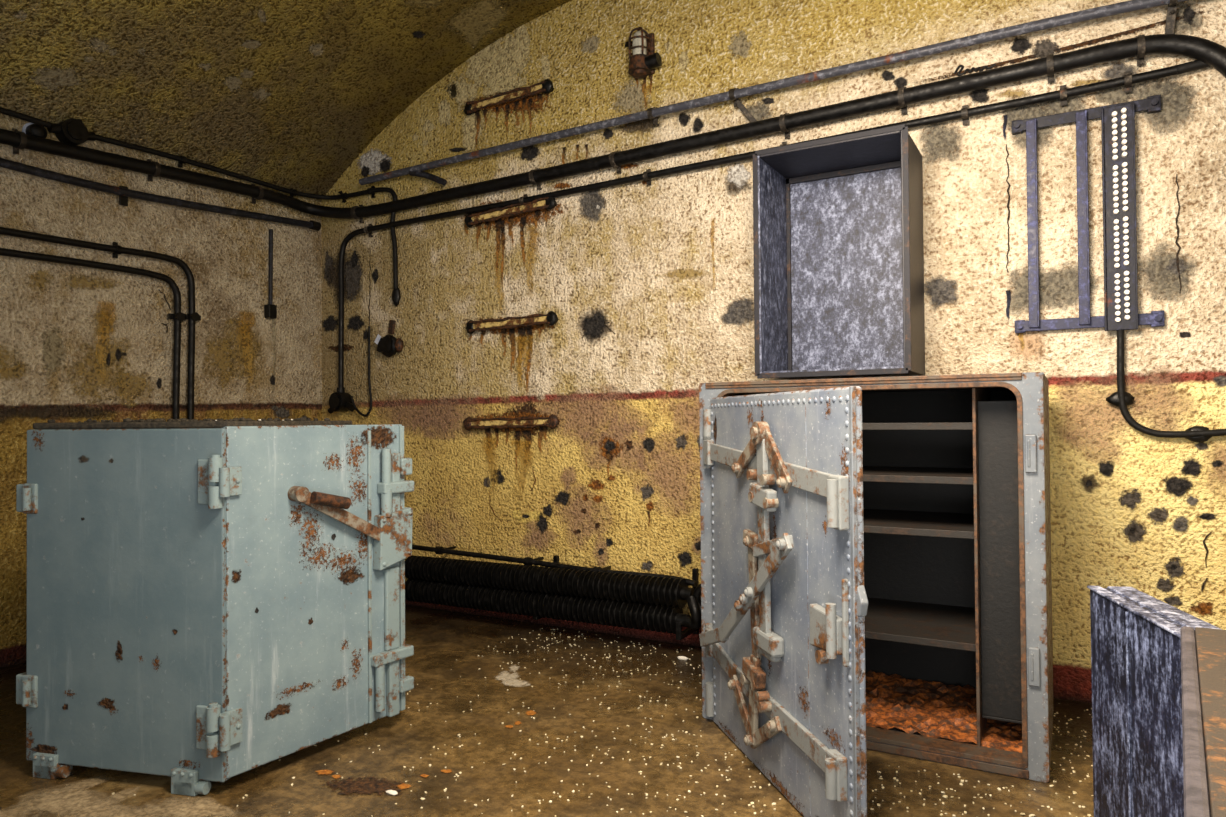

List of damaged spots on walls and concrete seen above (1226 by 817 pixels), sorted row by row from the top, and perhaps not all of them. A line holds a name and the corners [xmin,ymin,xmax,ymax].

rust [464,92,551,145]
rust [635,75,652,106]
rust [562,144,588,164]
rust [463,200,567,299]
damp [67,276,121,289]
damp [0,303,153,422]
damp [203,313,260,388]
rust [469,316,559,492]
damp [1065,392,1125,452]